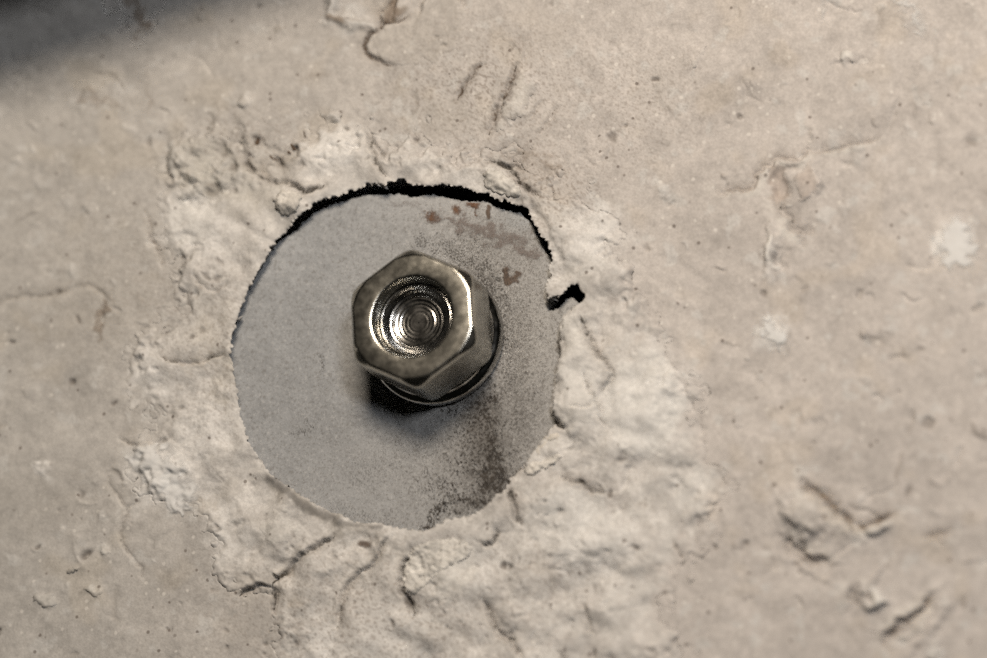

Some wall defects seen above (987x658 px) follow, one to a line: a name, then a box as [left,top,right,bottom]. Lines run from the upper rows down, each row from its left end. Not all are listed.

corrosion [424,203,540,259]
corrosion [502,267,521,285]
flaking render [121,73,740,658]